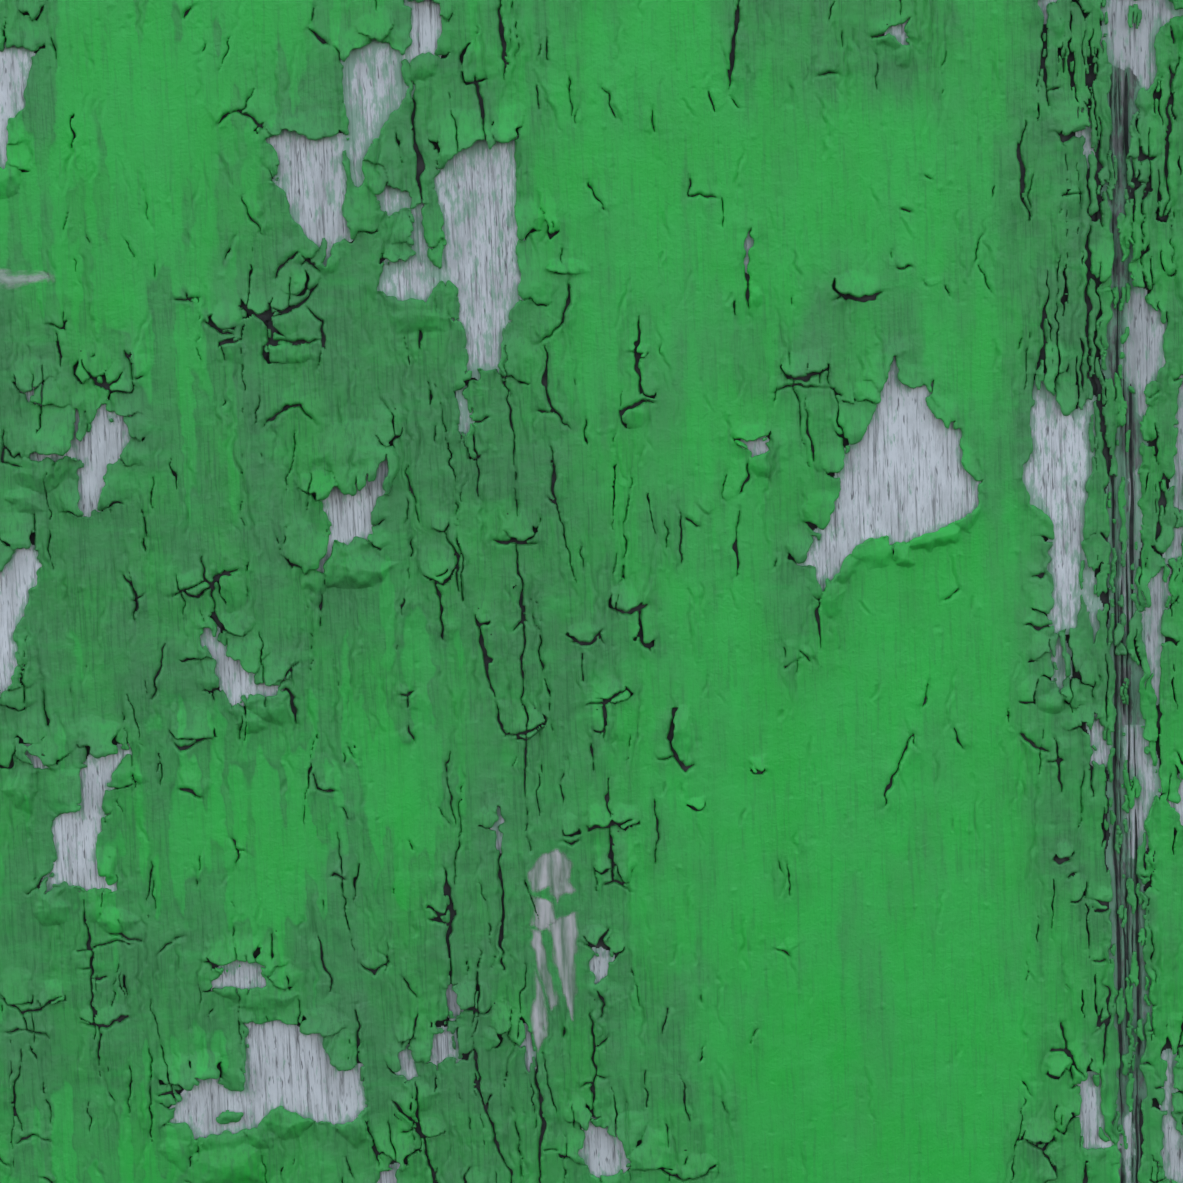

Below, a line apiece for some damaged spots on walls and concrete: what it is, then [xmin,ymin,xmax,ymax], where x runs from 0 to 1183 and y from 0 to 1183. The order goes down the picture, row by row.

crack [529,25,667,142]
crack [702,0,748,122]
peeling [229,0,594,515]
peeling [0,331,158,1084]
peeling [256,384,404,638]
crack [393,683,465,836]
crack [671,463,748,583]
peeling [766,348,984,657]
crack [876,674,970,816]
peeling [1017,0,1183,1183]
peeling [151,803,719,1183]
crack [1089,771,1165,1074]